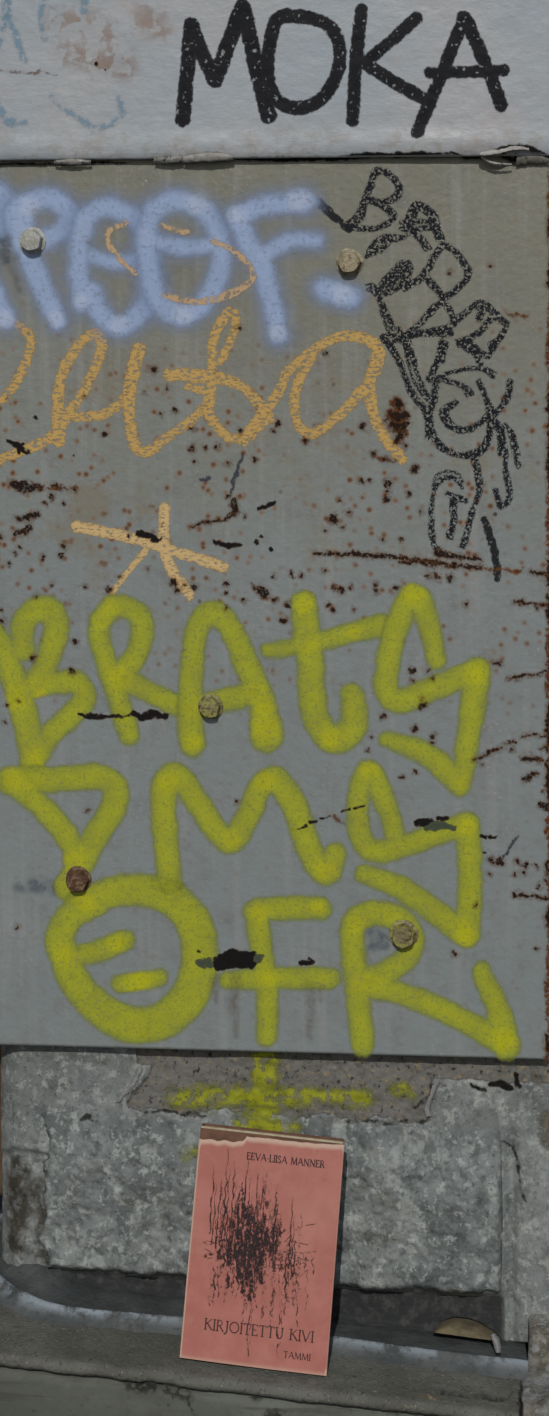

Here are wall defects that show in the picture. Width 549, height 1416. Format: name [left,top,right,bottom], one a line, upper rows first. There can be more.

rust [0,479,78,567]
rust [191,494,246,528]
rust [223,570,303,624]
rust [313,259,549,1084]